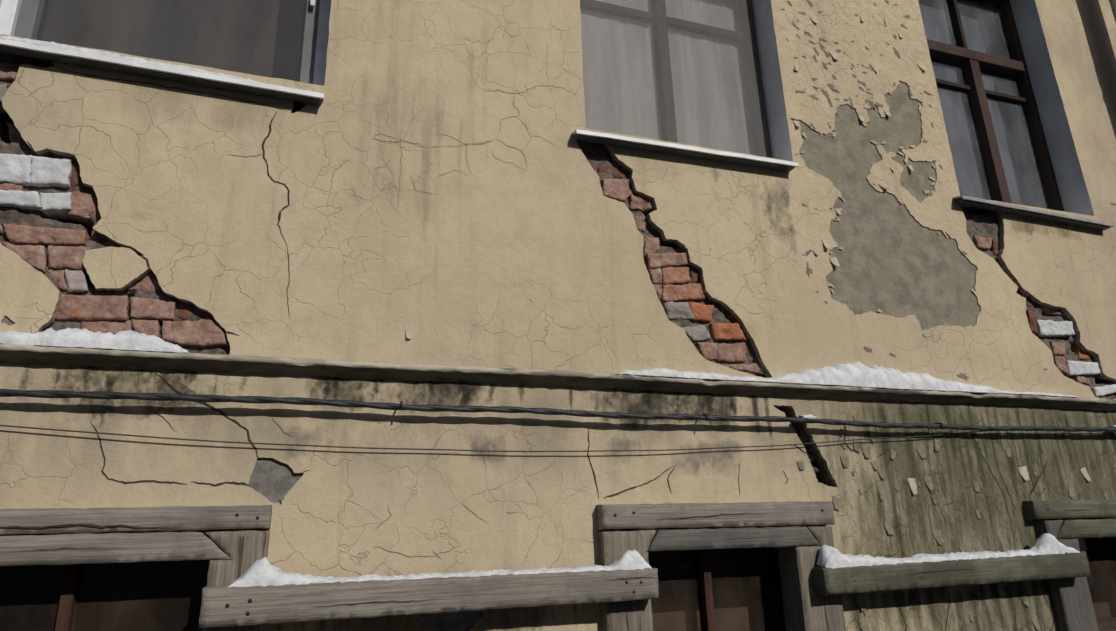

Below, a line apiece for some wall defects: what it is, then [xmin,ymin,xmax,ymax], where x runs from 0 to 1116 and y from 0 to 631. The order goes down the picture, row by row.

spalling [0,53,240,355]
crack [54,66,290,317]
peeling [780,0,999,338]
spalling [576,140,766,378]
spalling [1016,291,1116,399]
water stain [80,366,195,412]
crack [90,420,251,487]
crack [154,373,294,458]
spalling [249,458,303,503]
water stain [413,381,494,406]
crack [587,430,675,498]
water stain [596,389,736,427]